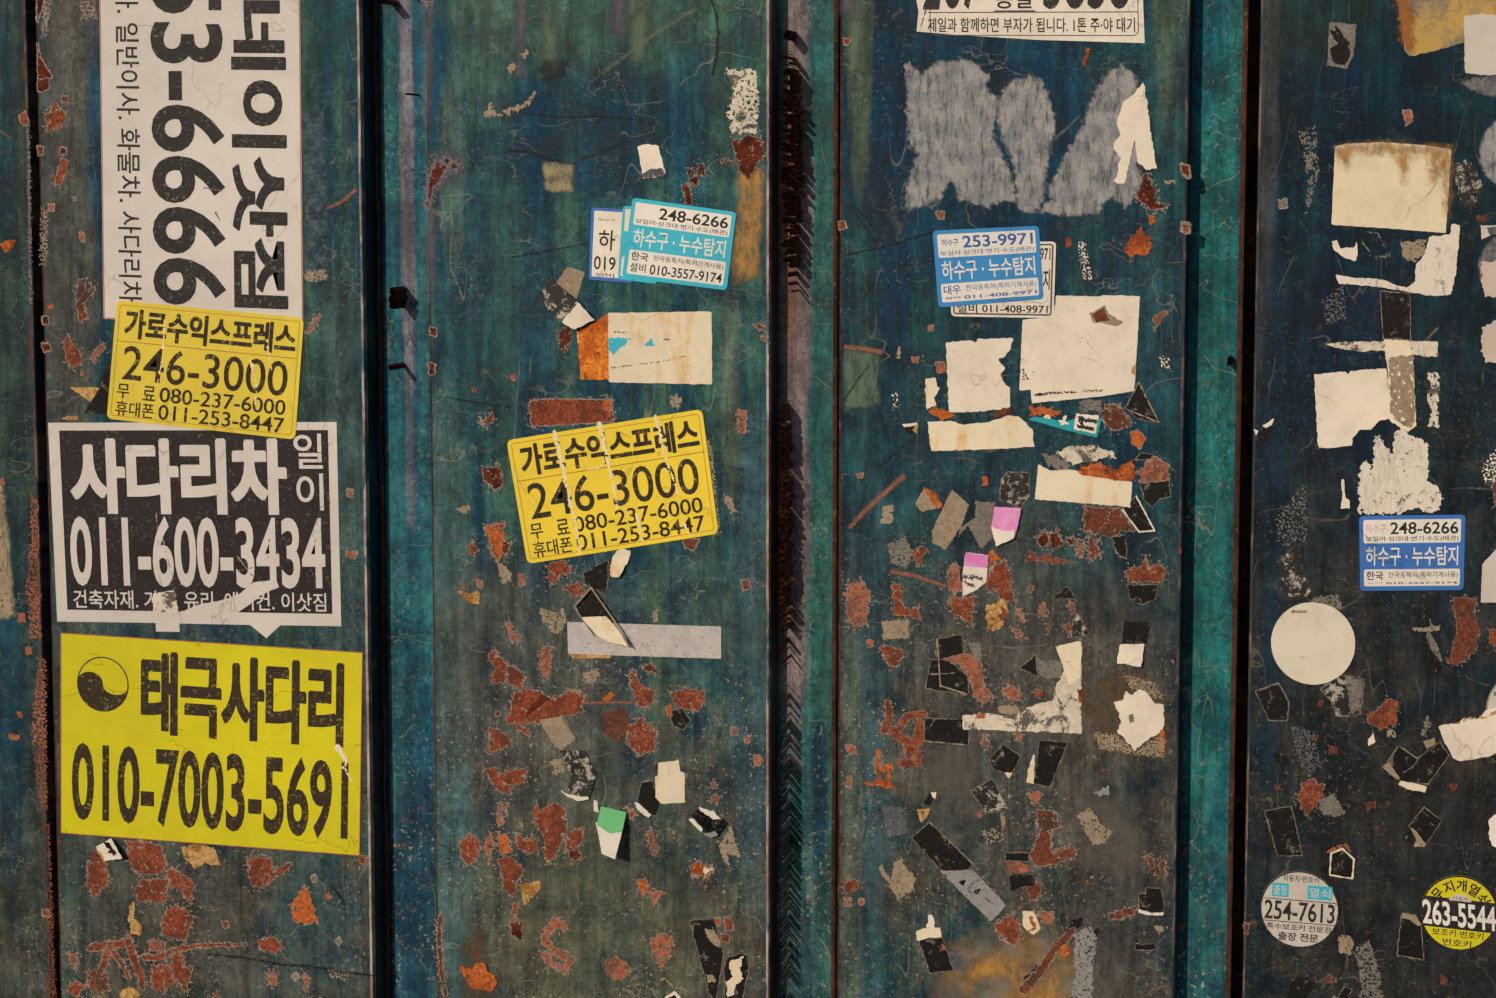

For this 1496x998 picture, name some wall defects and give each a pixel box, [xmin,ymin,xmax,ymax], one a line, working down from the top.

corrosion [0,110,67,353]
corrosion [986,550,1001,584]
corrosion [740,578,752,592]
corrosion [1124,676,1164,700]
corrosion [730,726,751,745]
corrosion [845,744,858,755]
corrosion [1092,730,1166,758]
corrosion [977,810,1005,844]
corrosion [843,897,865,907]
corrosion [713,916,735,944]